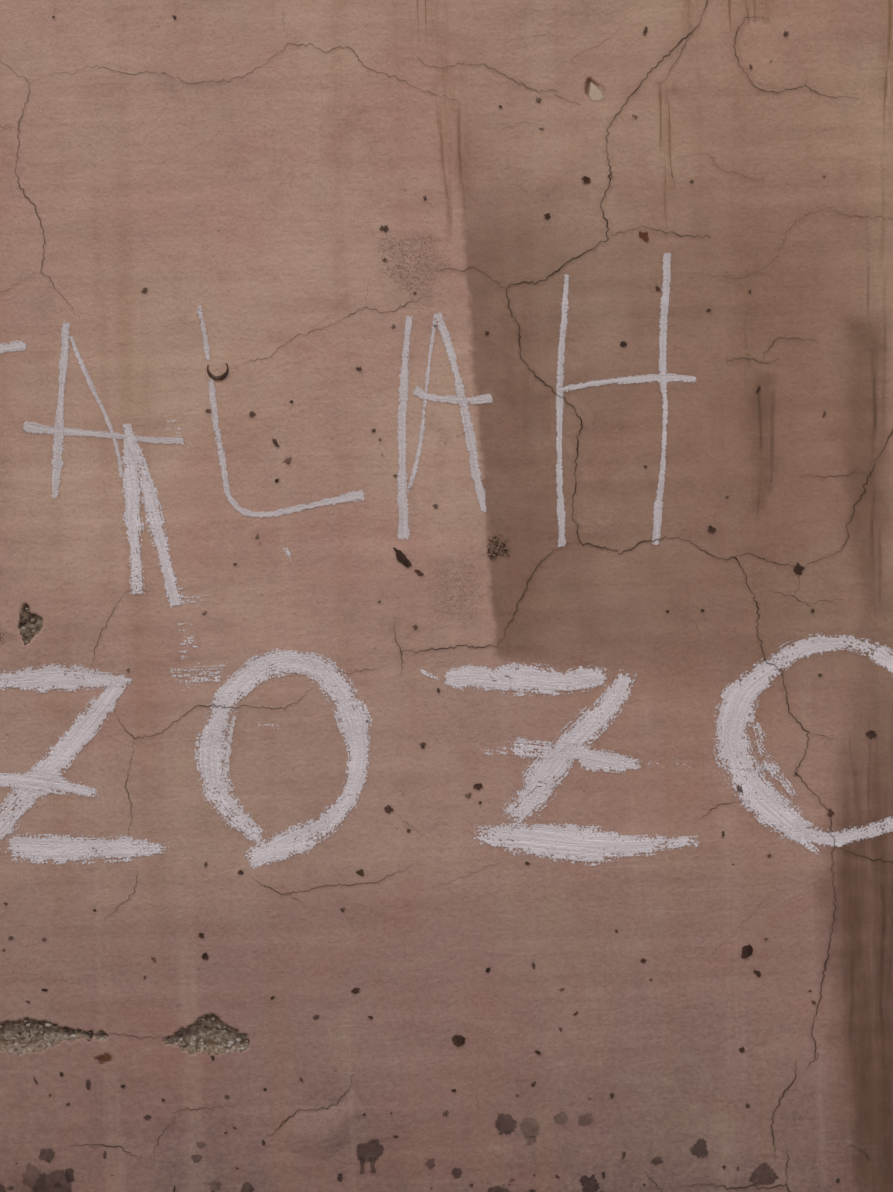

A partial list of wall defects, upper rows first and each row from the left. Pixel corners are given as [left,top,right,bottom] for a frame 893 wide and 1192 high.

crack [18,177,73,308]
crack [498,0,893,862]
crack [335,555,549,674]
crack [119,700,300,826]
crack [253,871,403,903]
flaking render [0,1018,108,1056]
flaking render [163,1014,252,1061]
damp [841,809,893,1192]